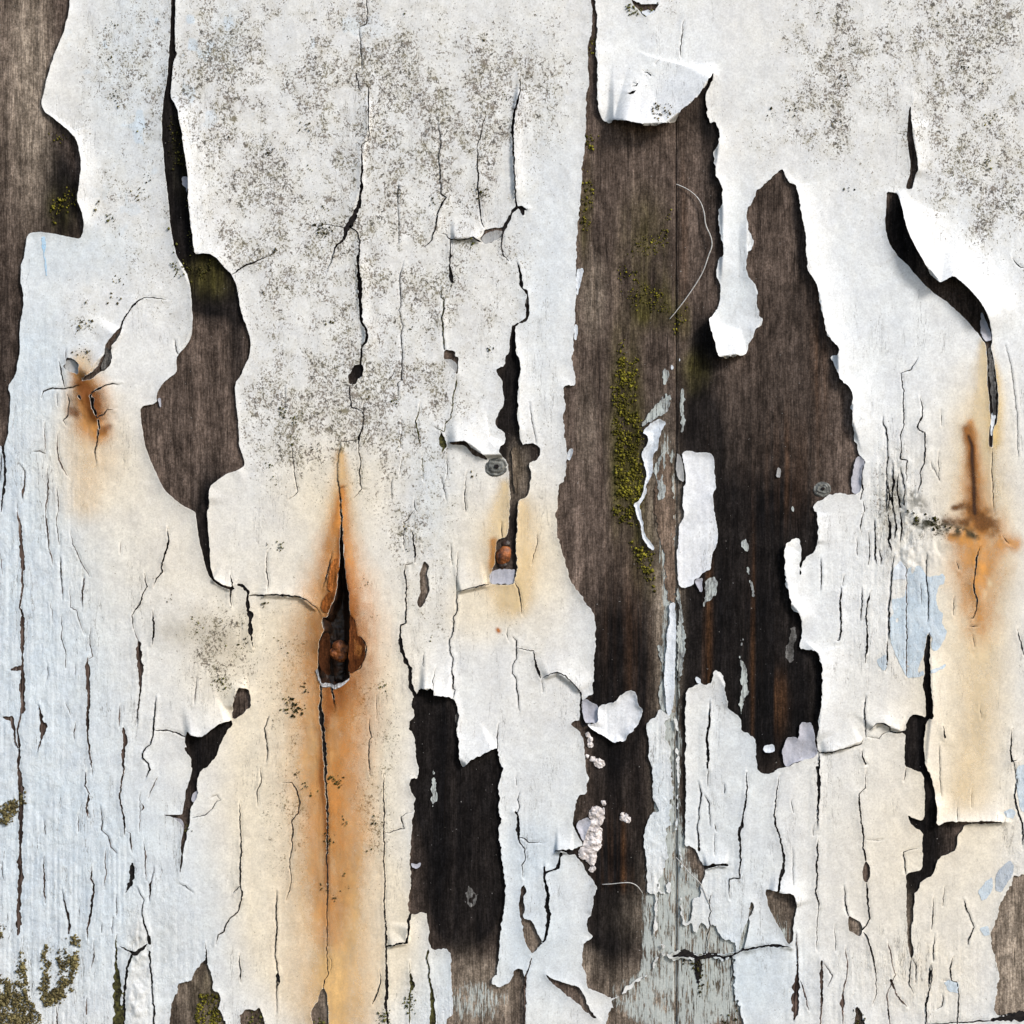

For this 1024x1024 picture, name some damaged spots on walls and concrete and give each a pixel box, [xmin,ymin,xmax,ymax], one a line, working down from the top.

peeling [0,0,84,446]
rust [70,356,109,457]
crack [0,362,186,1024]
peeling [140,0,251,589]
rust [300,453,363,1024]
peeling [408,688,527,1024]
crack [427,81,527,350]
rust [490,483,531,612]
peeling [546,0,865,1024]
crack [673,698,1024,1024]
crack [821,360,980,676]
rust [943,342,1019,661]